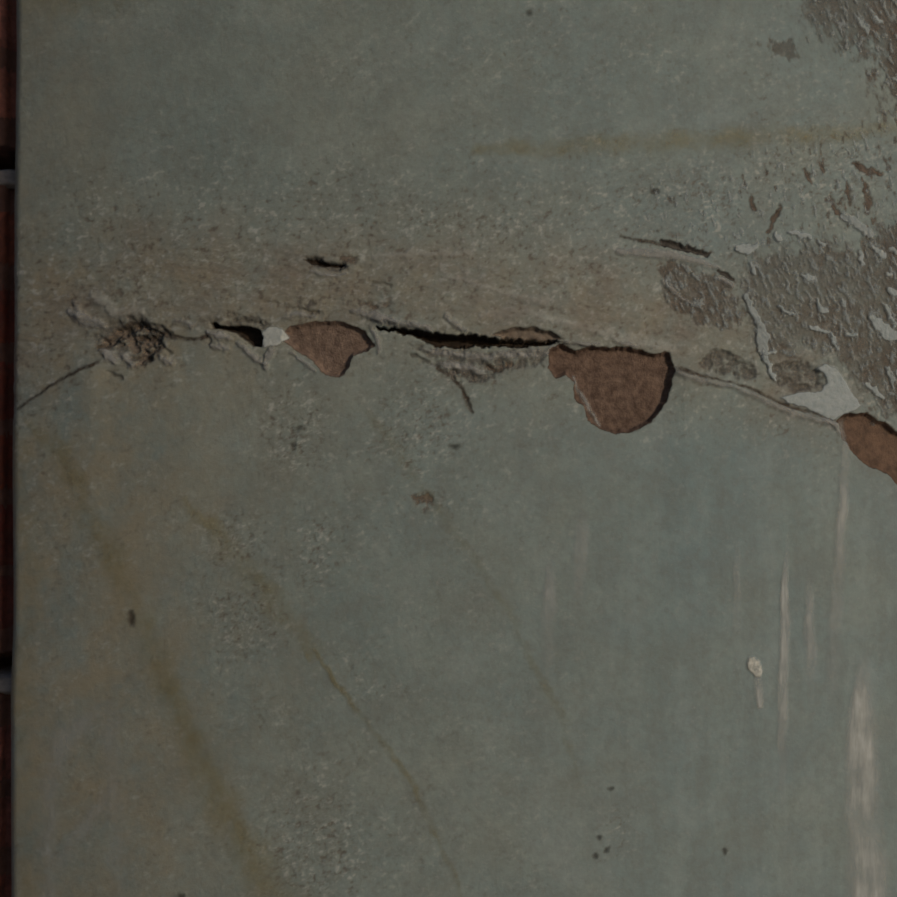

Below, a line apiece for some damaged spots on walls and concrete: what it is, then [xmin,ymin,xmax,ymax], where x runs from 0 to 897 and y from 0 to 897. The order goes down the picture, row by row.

peeling [828,0,897,106]
crack [21,309,272,407]
spalling [262,321,380,377]
crack [363,311,561,413]
spalling [548,342,675,434]
crack [680,368,836,420]
peeling [660,135,897,484]